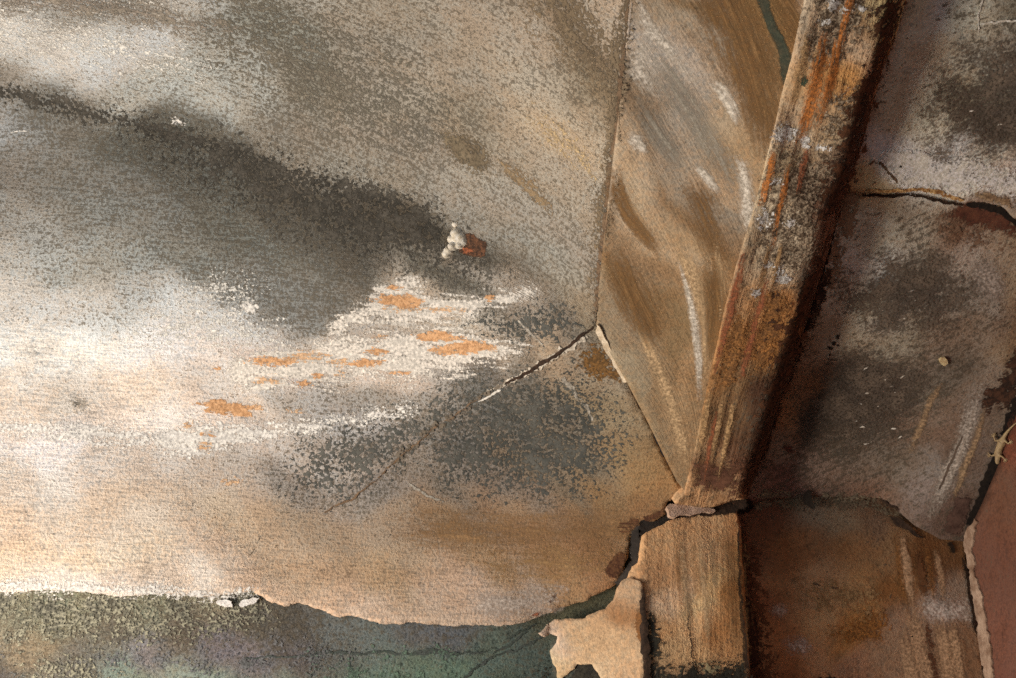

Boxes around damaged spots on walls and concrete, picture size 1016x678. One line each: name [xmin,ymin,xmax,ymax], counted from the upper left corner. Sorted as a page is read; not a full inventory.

water stain [0,0,561,219]
rust [790,0,854,143]
water stain [0,82,638,616]
crack [324,0,640,513]
rust [713,150,808,391]
water stain [608,0,1016,514]
crack [755,160,1016,478]
peeling [216,598,259,607]
peeling [538,552,644,678]
crack [615,499,749,678]
crack [881,499,924,538]
crack [948,397,1016,633]